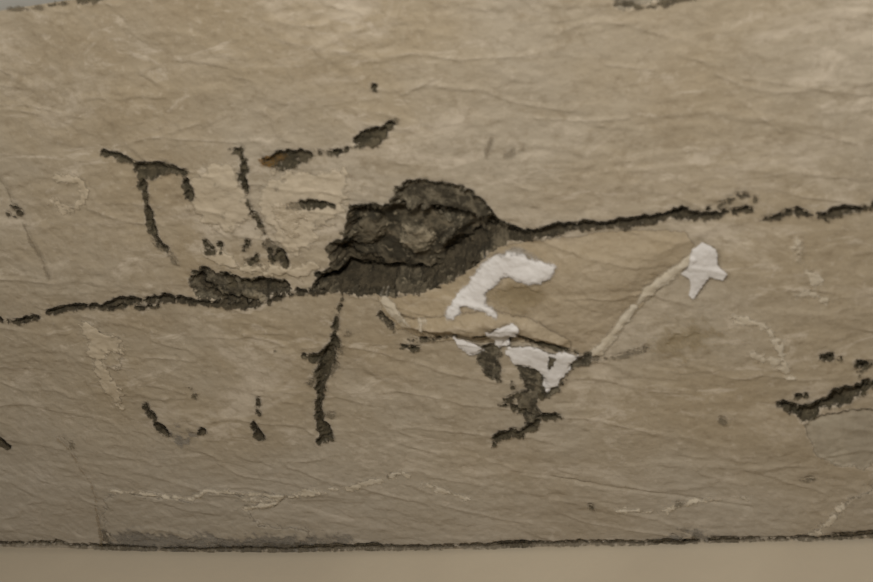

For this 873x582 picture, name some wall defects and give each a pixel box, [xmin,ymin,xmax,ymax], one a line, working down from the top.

spalling [613,0,691,11]
crack [100,149,196,266]
crack [202,118,399,269]
spalling [187,162,532,303]
crack [507,192,873,242]
crack [0,437,11,450]
crack [0,287,351,446]
crack [376,312,648,448]
spalling [776,360,873,421]
spalling [819,352,843,362]